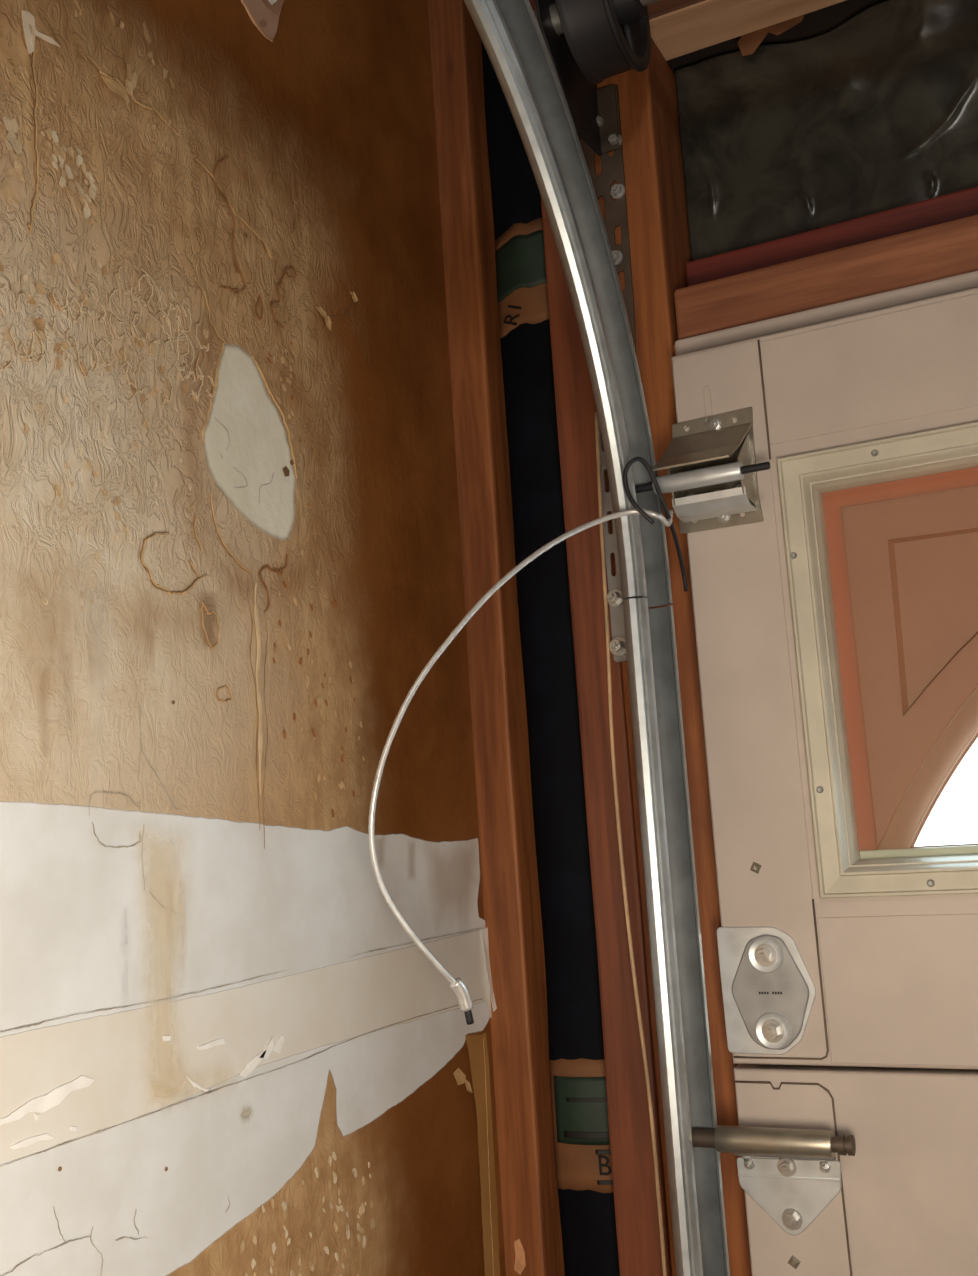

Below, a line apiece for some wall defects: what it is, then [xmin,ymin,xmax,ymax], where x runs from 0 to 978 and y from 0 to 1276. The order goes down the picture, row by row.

spalling [241,0,284,42]
peeling [102,64,137,104]
peeling [41,128,97,223]
spalling [0,253,312,539]
crack [140,493,288,849]